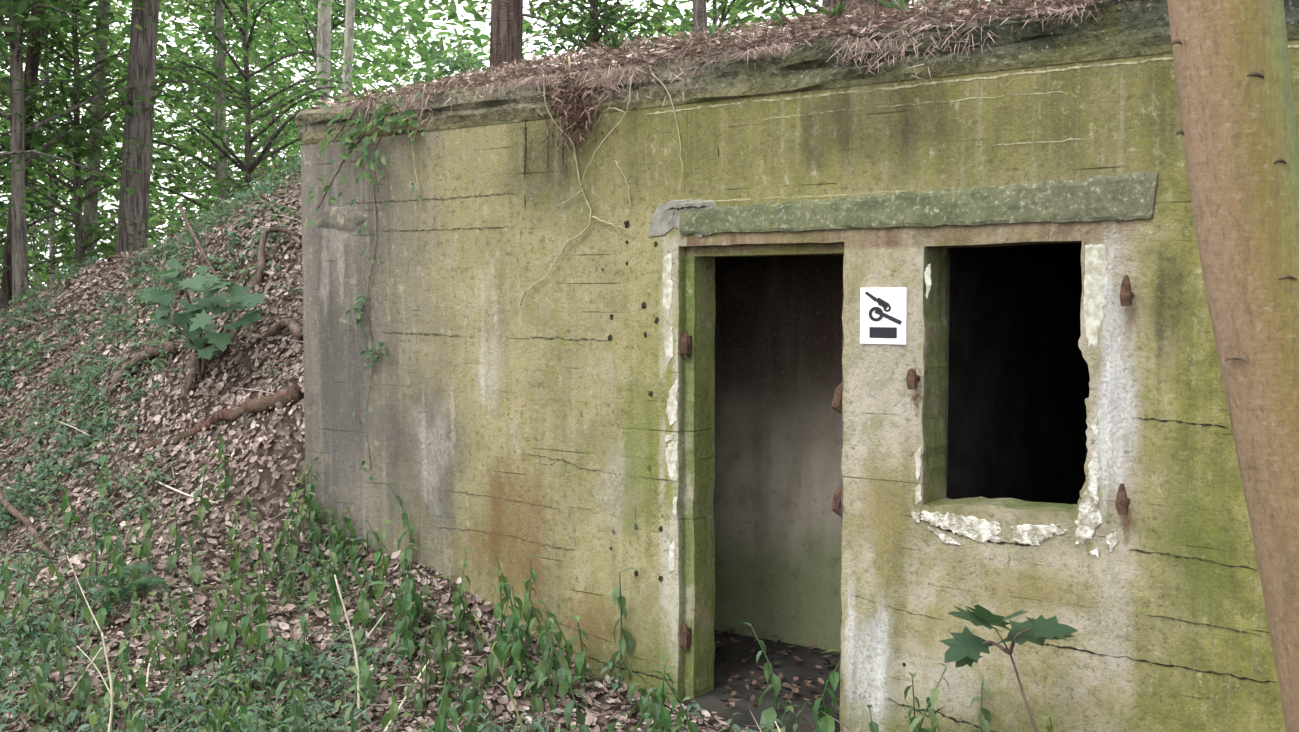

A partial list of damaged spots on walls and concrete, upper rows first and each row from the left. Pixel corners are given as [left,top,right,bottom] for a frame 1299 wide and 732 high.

peeling [911,244,1123,558]
crack [1129,549,1258,572]
crack [1044,643,1274,683]
crack [846,690,994,732]